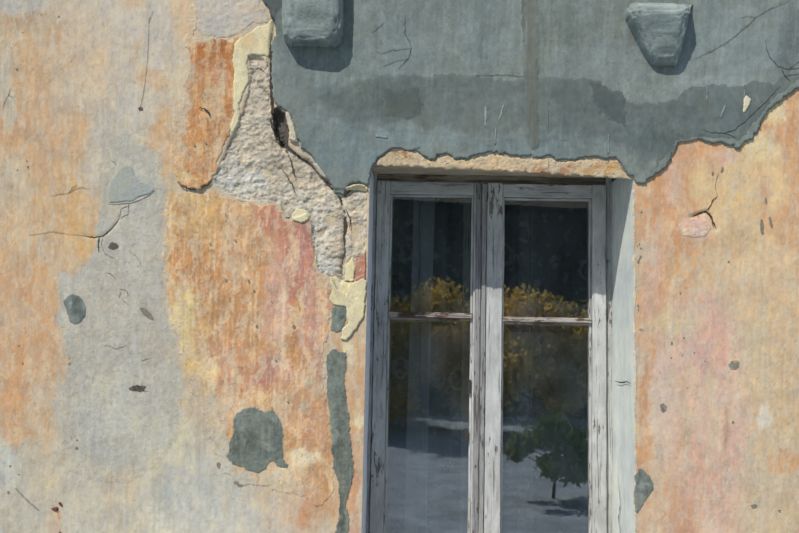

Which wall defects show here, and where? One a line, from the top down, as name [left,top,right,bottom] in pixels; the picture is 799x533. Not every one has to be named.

crack [702,39,799,140]
crack [31,192,154,305]
peeling [55,0,367,507]
crack [247,20,351,280]
crack [691,176,718,227]